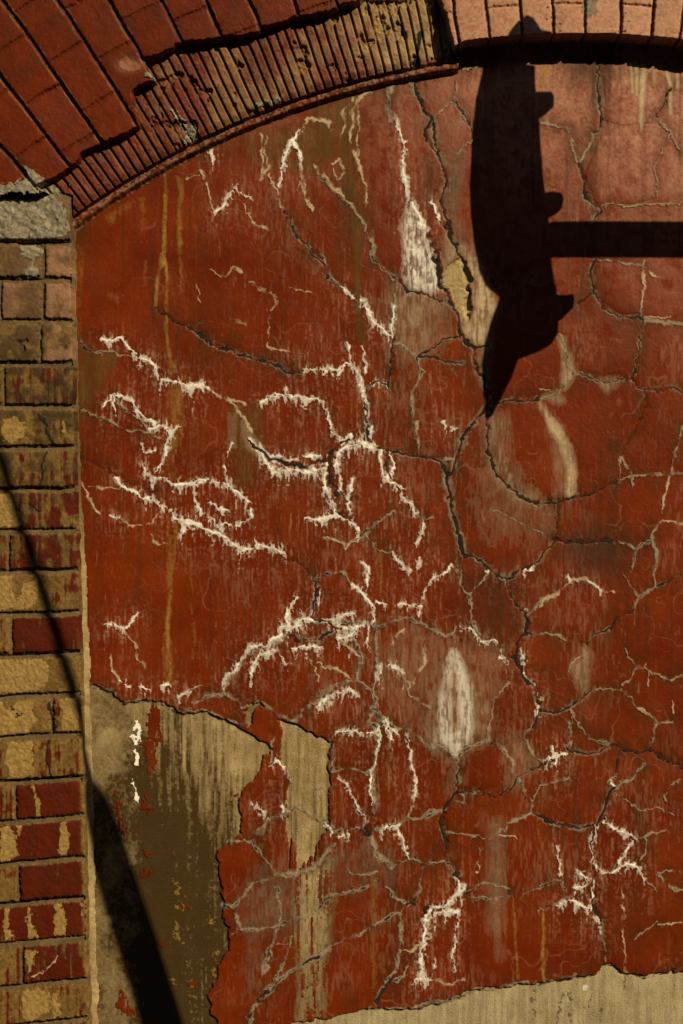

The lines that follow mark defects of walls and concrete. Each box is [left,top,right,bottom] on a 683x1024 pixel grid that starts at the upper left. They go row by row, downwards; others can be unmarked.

water stain [386,84,440,292]
crack [408,31,484,257]
crack [539,59,681,223]
spalling [440,257,473,320]
water stain [80,335,253,433]
water stain [80,393,287,558]
water stain [260,387,353,442]
crack [82,176,683,1024]
water stain [323,562,458,657]
peeling [0,658,50,817]
peeling [53,902,67,936]
peeling [59,684,683,1024]